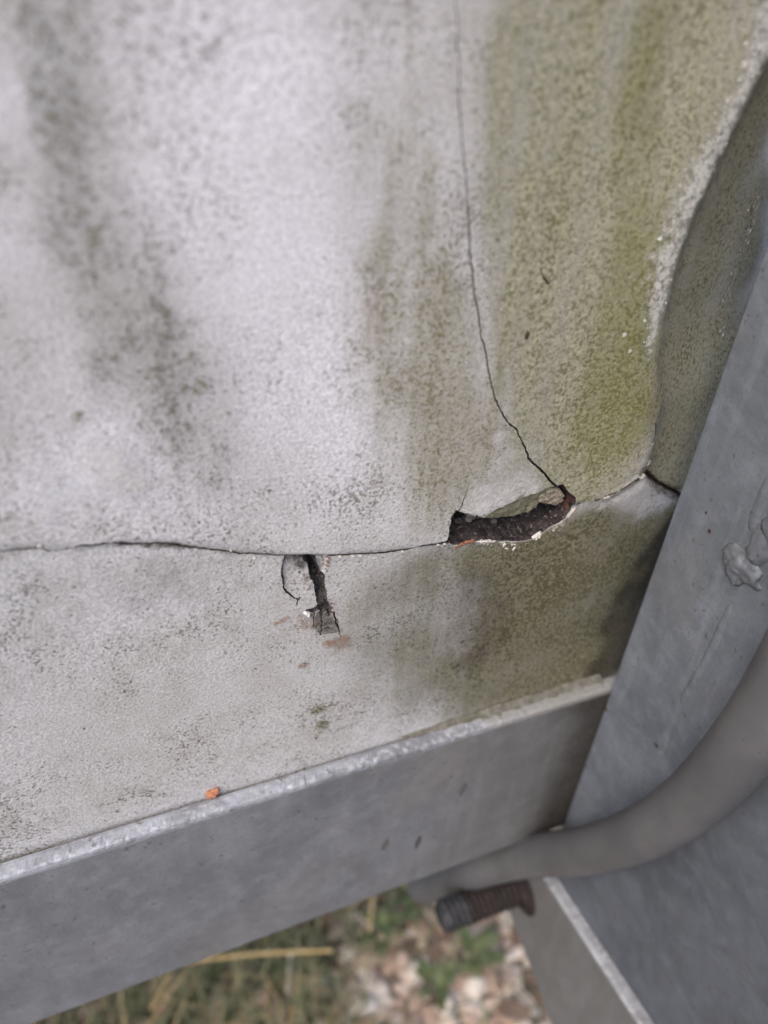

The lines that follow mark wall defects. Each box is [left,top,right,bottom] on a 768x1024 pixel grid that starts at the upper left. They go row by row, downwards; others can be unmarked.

crack [455,0,557,486]
leakage [571,0,676,473]
crack [0,541,285,560]
crack [326,539,450,559]
leakage [471,474,539,515]
spalling [437,484,576,551]
leakage [612,479,650,511]
spalling [281,554,341,636]
leakage [589,516,673,676]